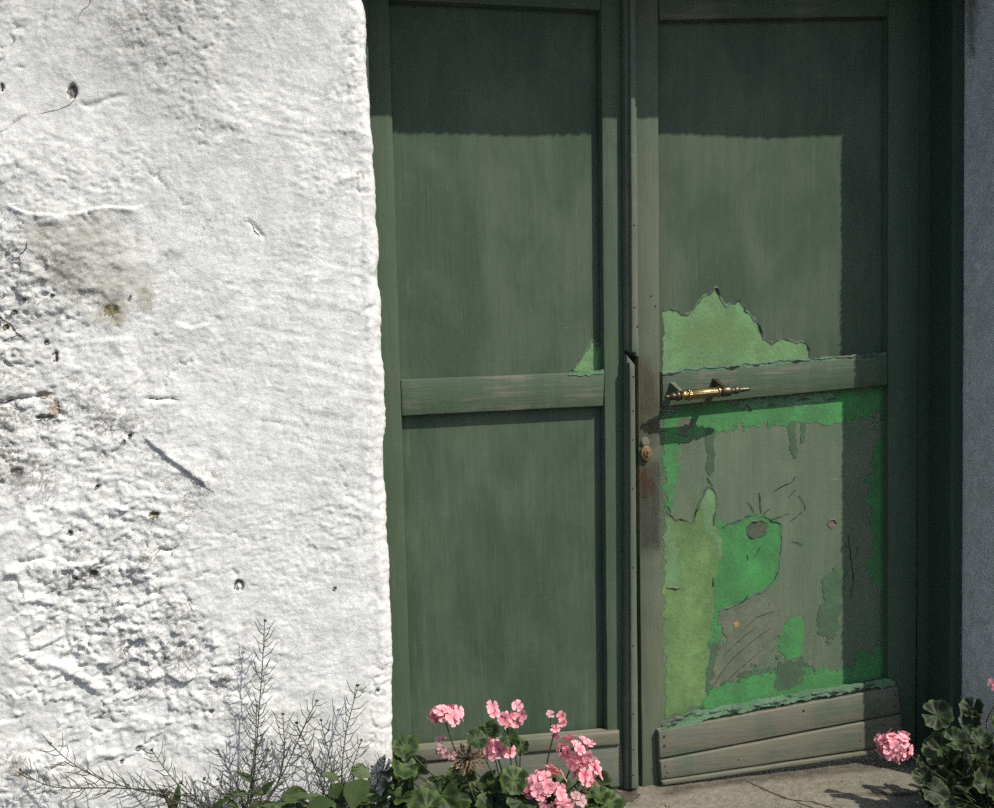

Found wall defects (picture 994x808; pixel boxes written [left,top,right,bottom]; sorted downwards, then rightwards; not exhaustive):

peeling [569,339,604,376]
peeling [662,286,887,375]
peeling [660,385,895,731]